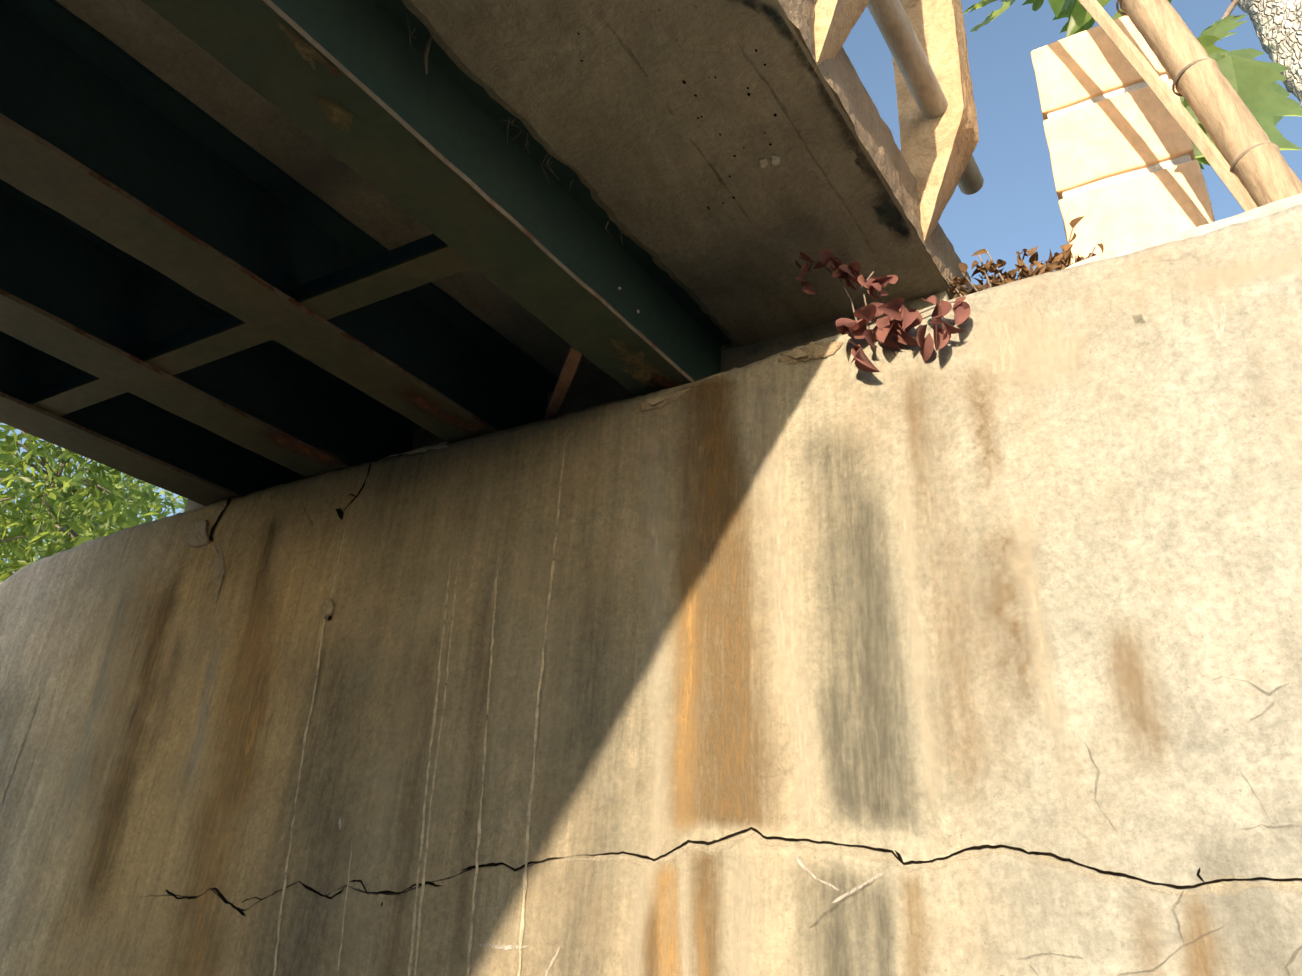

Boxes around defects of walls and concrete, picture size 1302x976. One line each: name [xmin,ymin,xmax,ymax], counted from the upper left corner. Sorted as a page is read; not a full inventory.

damp [744,0,786,33]
crack [336,462,371,520]
crack [180,498,231,603]
corrosion [678,381,763,824]
damp [826,450,887,813]
corrosion [645,872,680,976]
corrosion [697,853,717,976]
crack [146,827,1302,916]